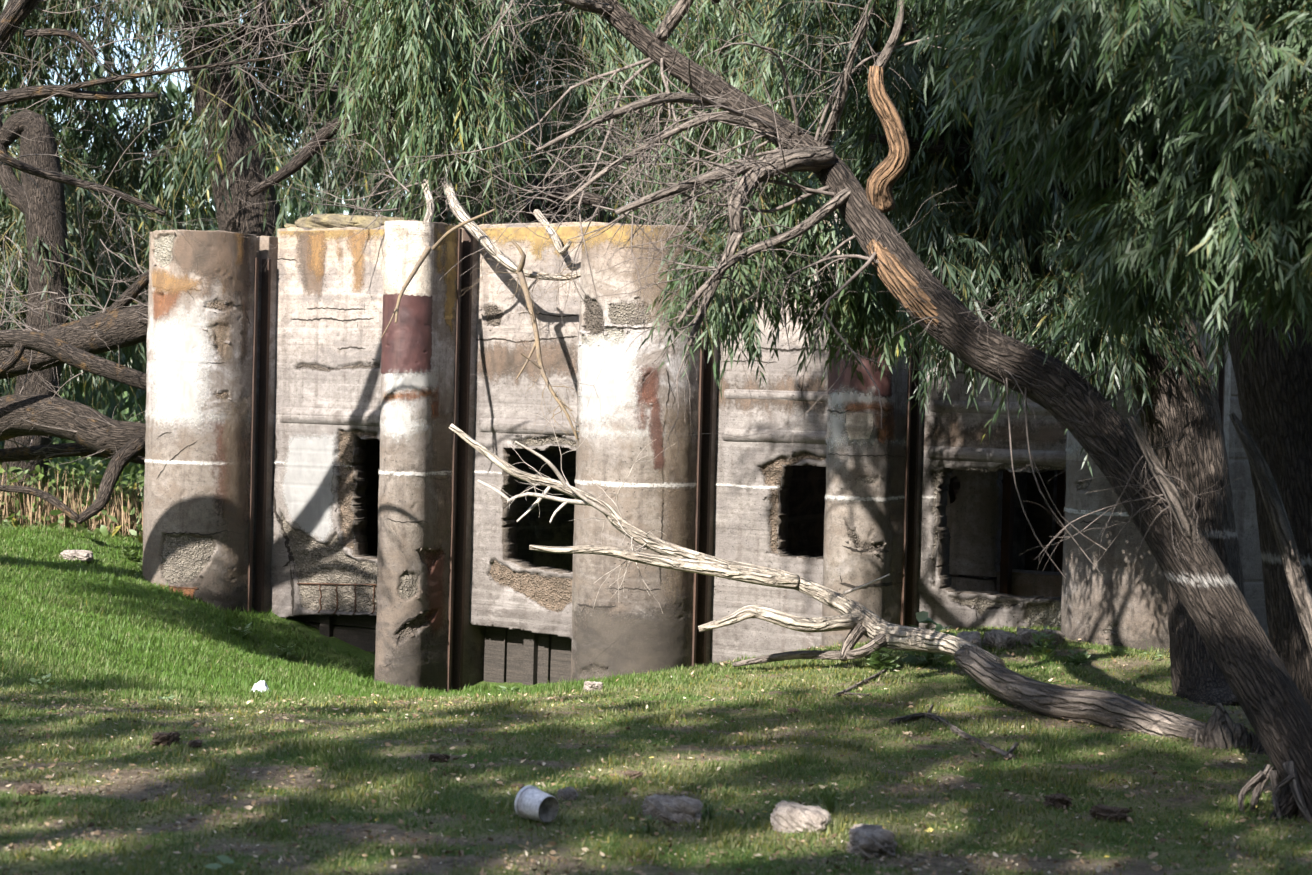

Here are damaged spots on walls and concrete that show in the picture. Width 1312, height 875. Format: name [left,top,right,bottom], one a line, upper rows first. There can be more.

corrosion [307,230,370,291]
corrosion [151,269,201,319]
spalling [578,295,652,349]
corrosion [384,387,439,417]
crack [272,434,295,615]
spalling [929,463,1064,585]
spalling [159,530,216,589]
spalling [949,596,1061,628]